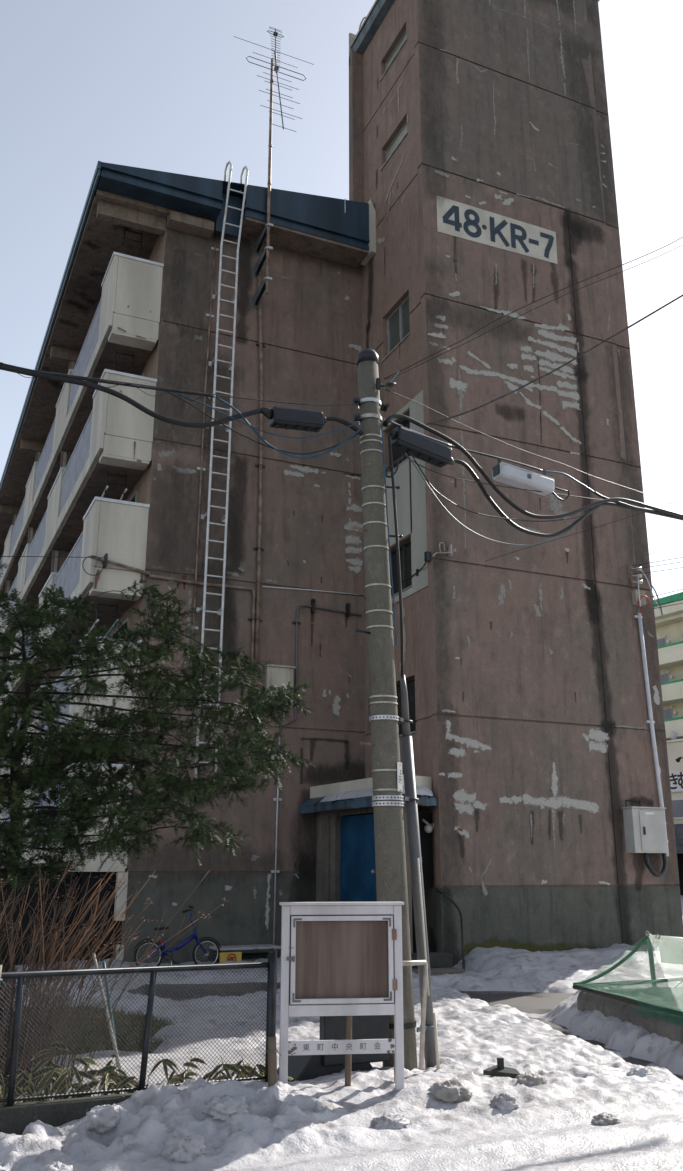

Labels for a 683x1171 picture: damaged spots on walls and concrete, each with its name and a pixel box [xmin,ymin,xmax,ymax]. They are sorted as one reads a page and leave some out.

peeling [480,306,526,319]
spalling [284,465,326,487]
peeling [344,475,363,573]
damp [517,193,658,944]